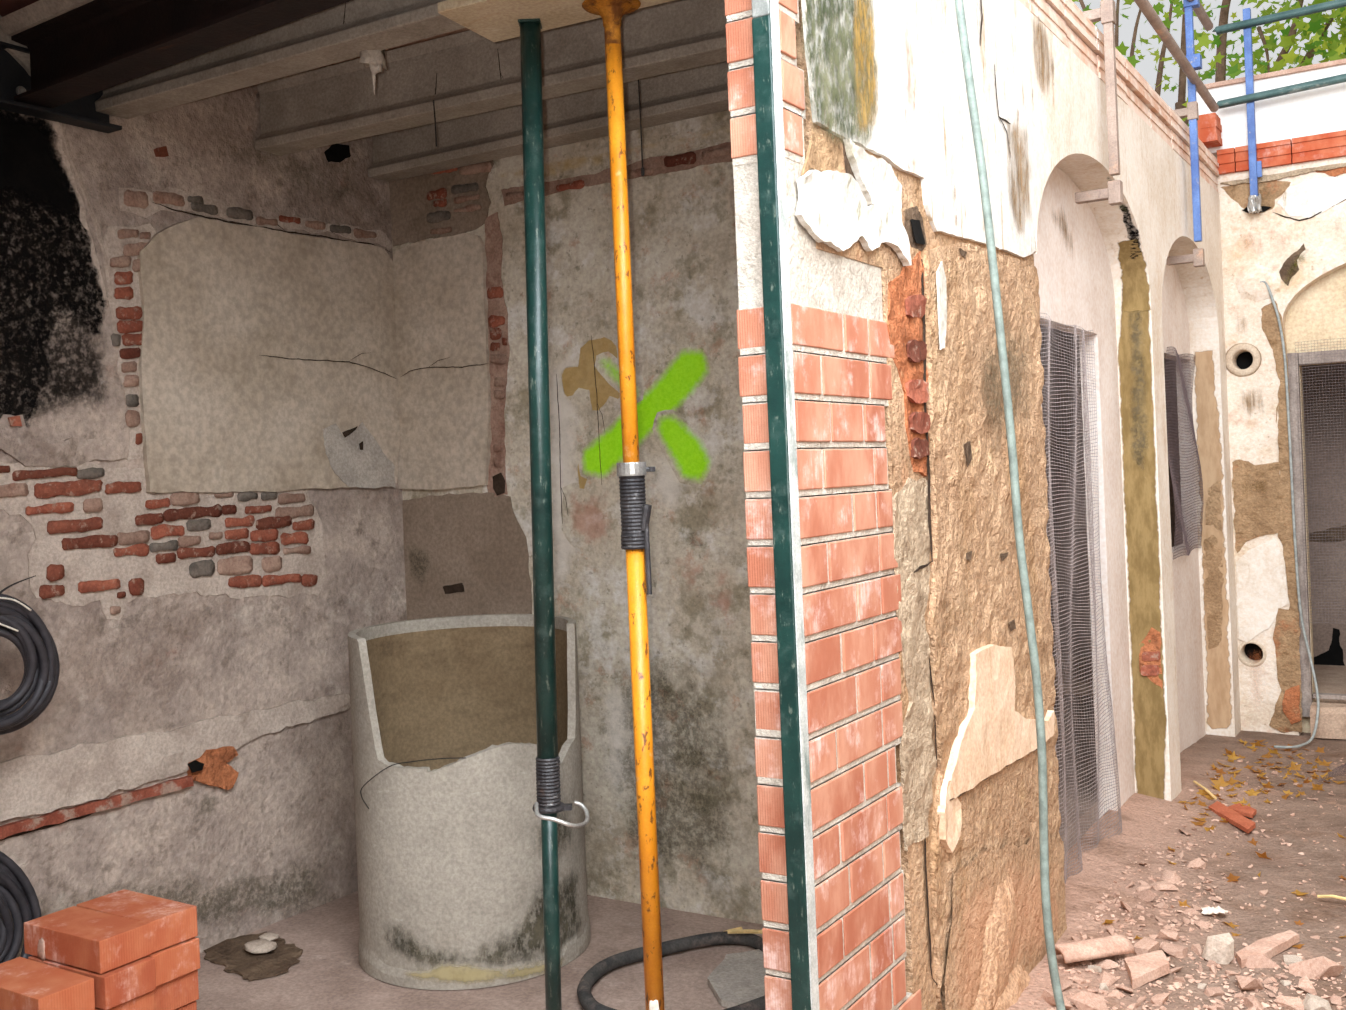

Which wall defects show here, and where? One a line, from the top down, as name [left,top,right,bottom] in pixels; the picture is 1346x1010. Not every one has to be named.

water stain [803,0,877,142]
flaking render [627,142,733,179]
flaking render [544,168,611,196]
spalling [1279,244,1305,286]
peeling [795,127,930,477]
crack [261,352,488,379]
flaking render [0,160,524,620]
spalling [964,441,972,467]
spalling [1202,301,1303,733]